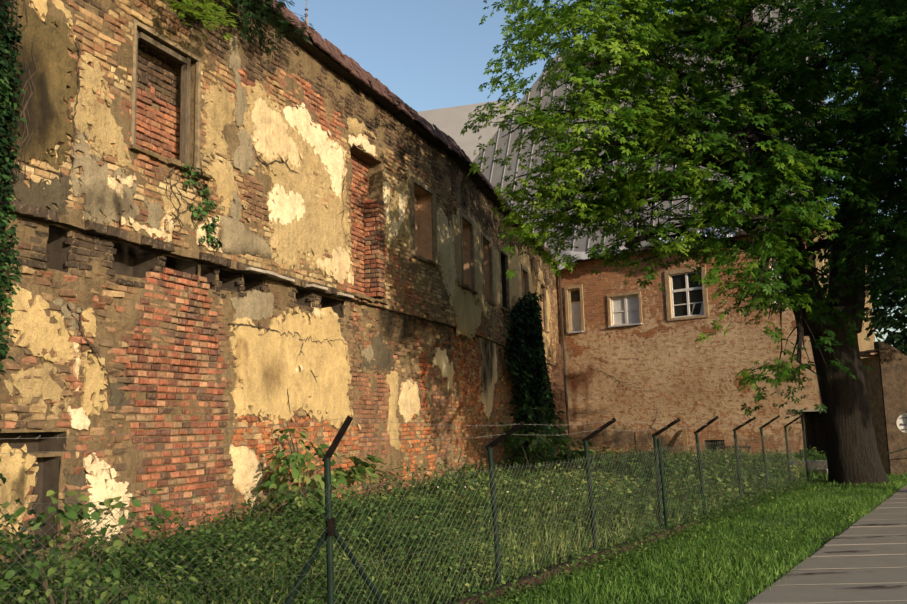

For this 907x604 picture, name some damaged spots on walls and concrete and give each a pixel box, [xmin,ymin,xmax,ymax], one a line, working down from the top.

water stain [19,53,53,144]
peeling [0,0,376,286]
peeling [0,284,128,430]